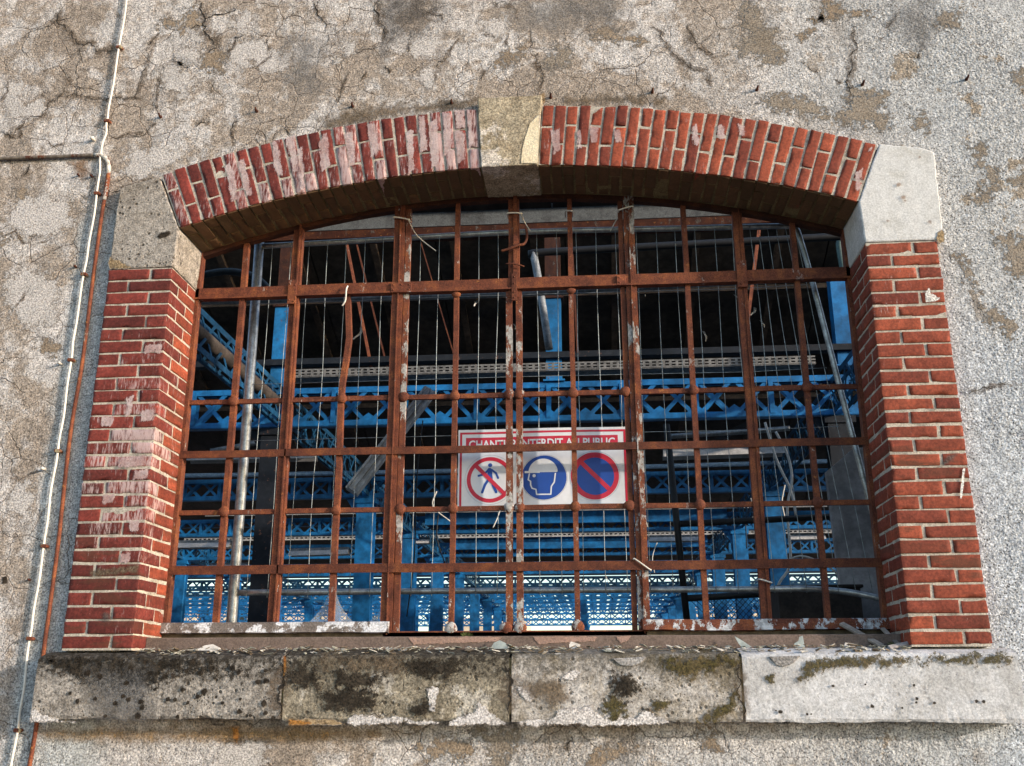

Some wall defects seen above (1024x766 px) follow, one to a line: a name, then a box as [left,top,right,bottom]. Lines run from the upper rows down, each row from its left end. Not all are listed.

crack [0,12,165,175]
crack [192,3,240,55]
crack [653,26,730,88]
crack [802,26,858,107]
mould [40,649,224,706]
damp [283,653,459,717]
damp [410,696,435,722]
damp [521,679,568,709]
mould [607,669,643,705]